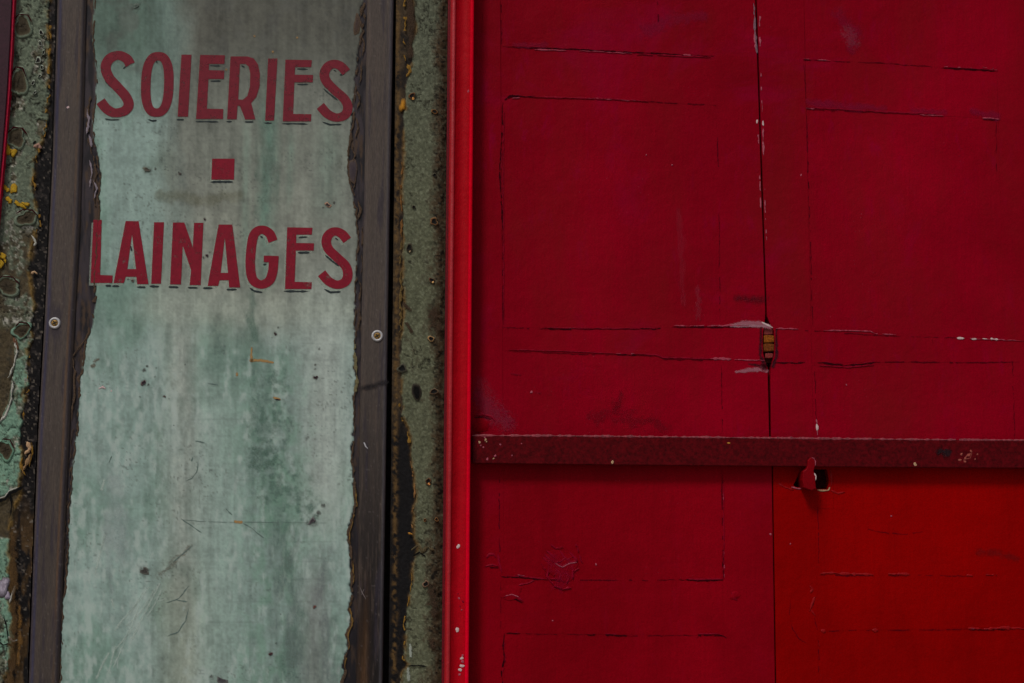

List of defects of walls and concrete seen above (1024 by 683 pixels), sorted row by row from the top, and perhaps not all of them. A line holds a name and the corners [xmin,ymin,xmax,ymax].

corrosion [403,0,415,77]
peeling [0,337,19,422]
peeling [0,486,24,518]
peeling [59,96,101,683]
peeling [340,3,366,683]
crack [499,58,1019,438]